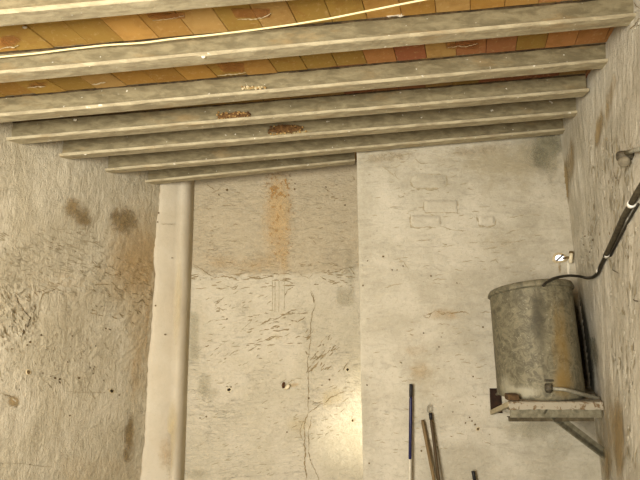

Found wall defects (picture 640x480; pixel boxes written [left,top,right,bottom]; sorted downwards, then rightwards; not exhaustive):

spalling [216,111,251,119]
spalling [268,124,307,135]
crack [300,291,345,480]